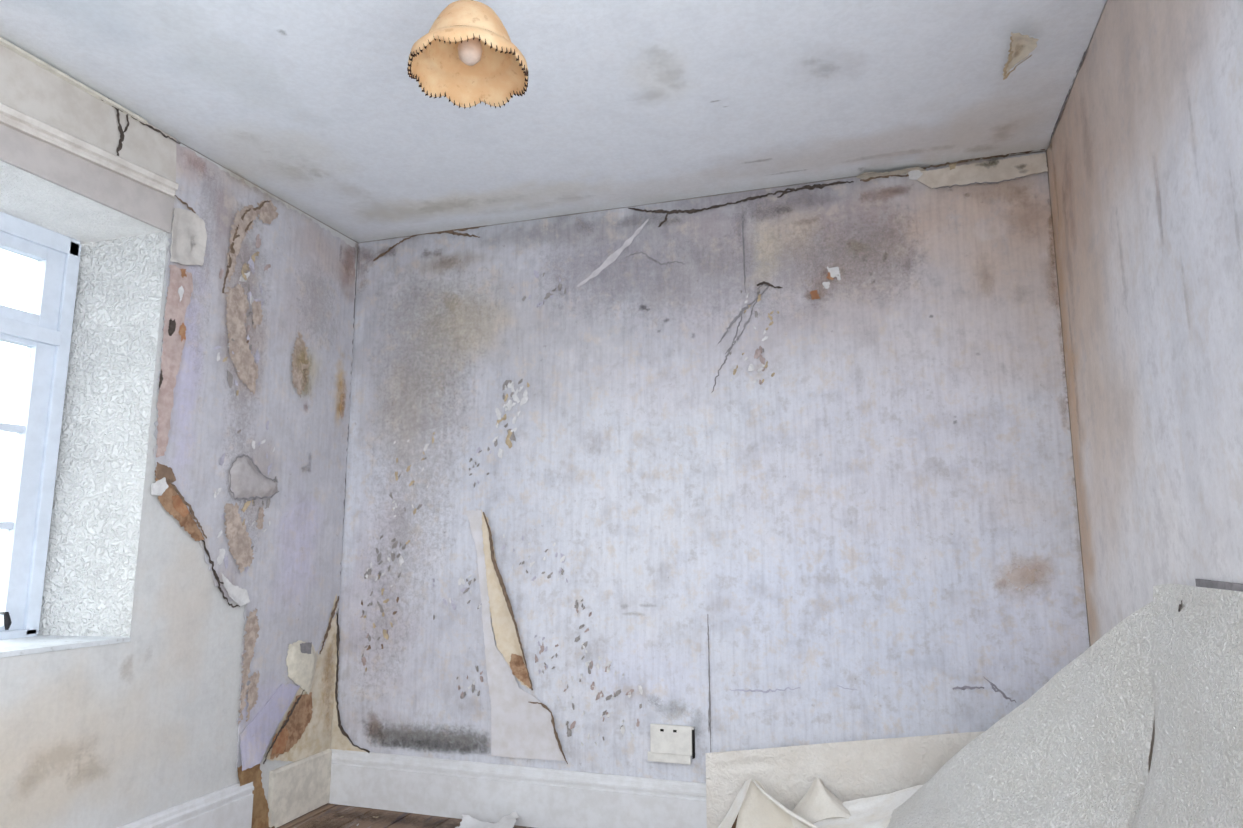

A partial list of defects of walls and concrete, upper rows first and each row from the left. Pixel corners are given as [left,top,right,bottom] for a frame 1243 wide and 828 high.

peeling [1002,32,1039,80]
crack [102,98,180,156]
crack [577,49,1087,393]
peeling [906,153,1048,189]
spalling [214,200,279,396]
spalling [151,208,271,725]
peeling [389,432,435,517]
peeling [360,534,410,672]
peeling [501,534,577,583]
spalling [238,594,370,828]